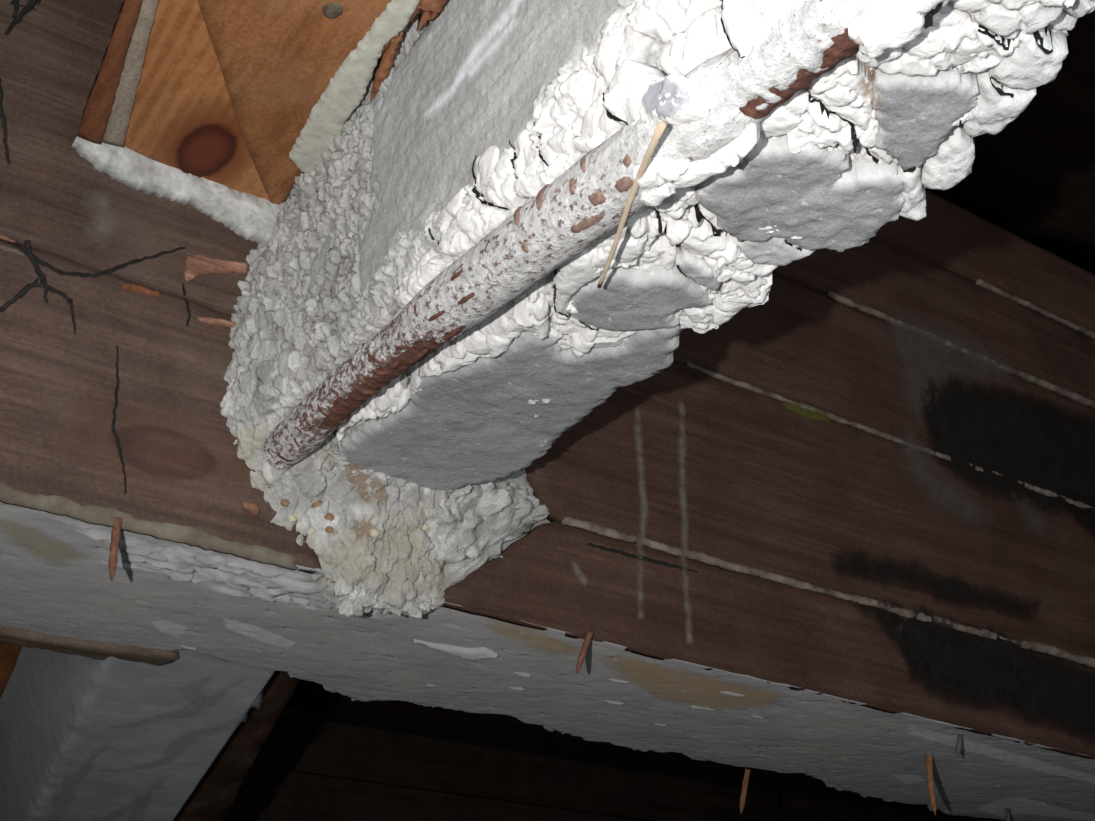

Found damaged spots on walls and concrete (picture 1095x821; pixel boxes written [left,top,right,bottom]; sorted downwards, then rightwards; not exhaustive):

crack [924,2,943,29]
crack [978,25,1053,54]
crack [509,122,549,179]
crack [602,93,629,125]
crack [808,91,916,173]
crack [988,71,1014,98]
crack [472,155,509,210]
crack [653,207,687,278]
crack [686,204,727,236]
water stain [895,324,1095,535]
water stain [837,553,1037,616]
water stain [861,604,1095,737]